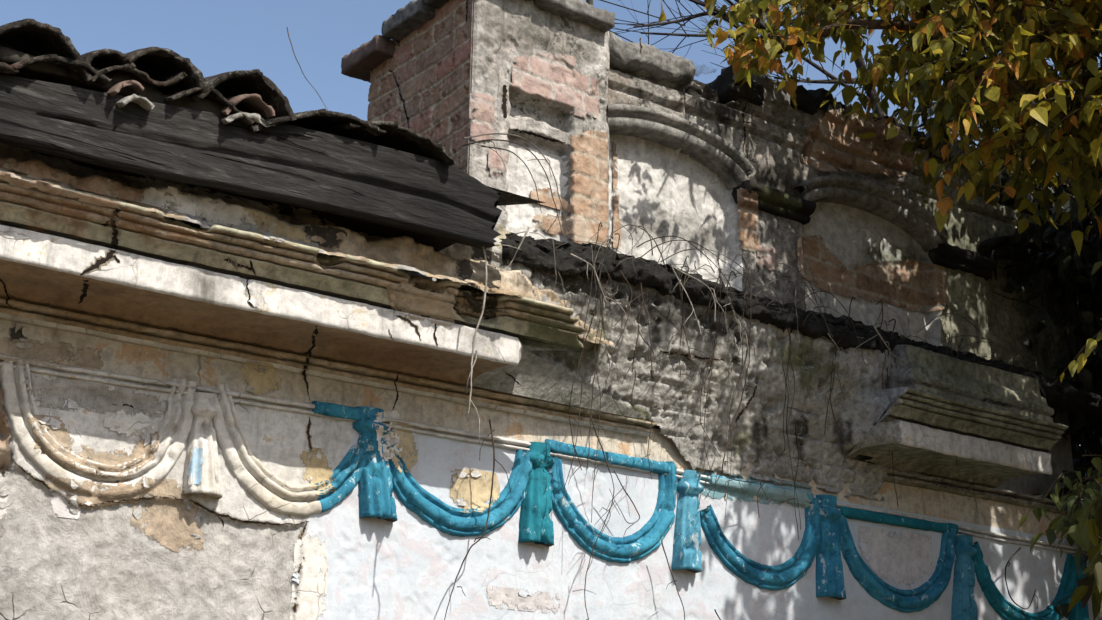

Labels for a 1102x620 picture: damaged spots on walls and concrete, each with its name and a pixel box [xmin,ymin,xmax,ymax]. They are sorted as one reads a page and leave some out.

flaking render [0,323,204,552]